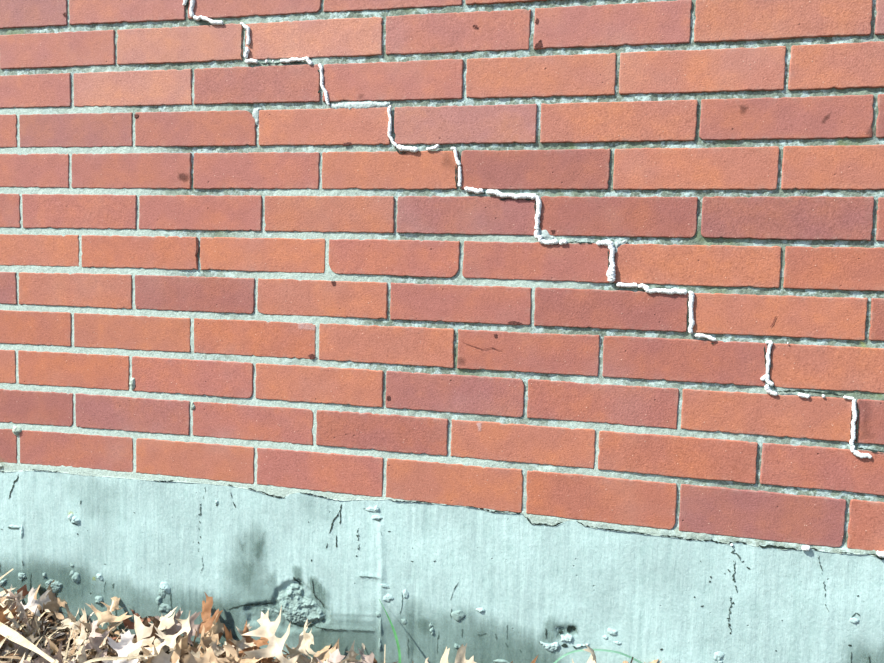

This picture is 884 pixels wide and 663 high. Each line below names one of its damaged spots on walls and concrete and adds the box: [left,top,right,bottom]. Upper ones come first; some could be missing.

crack [183,0,716,344]
crack [760,317,884,459]
crack [228,484,360,548]
damp [294,570,325,609]
crack [469,506,847,632]